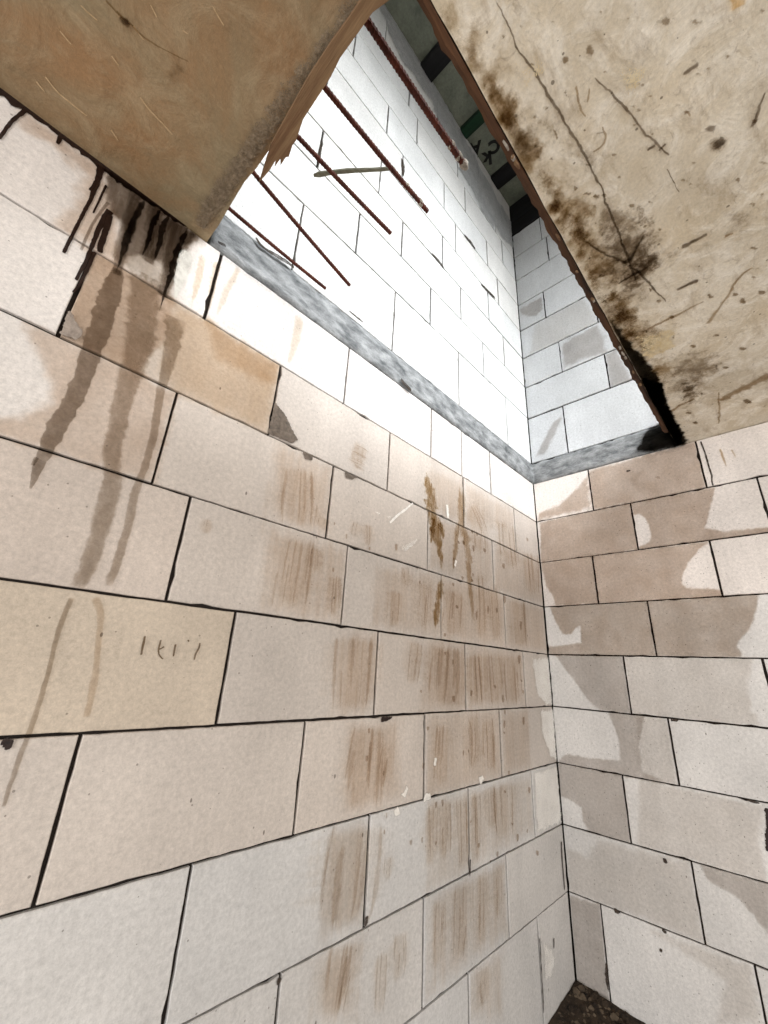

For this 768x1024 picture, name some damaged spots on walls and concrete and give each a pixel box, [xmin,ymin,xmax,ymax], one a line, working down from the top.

leakage [0,107,29,139]
leakage [62,166,114,292]
leakage [117,201,194,305]
spalling [252,170,351,287]
spalling [297,134,392,235]
spalling [323,85,429,214]
crack [498,6,666,301]
crack [595,78,679,192]
leakage [636,329,676,360]